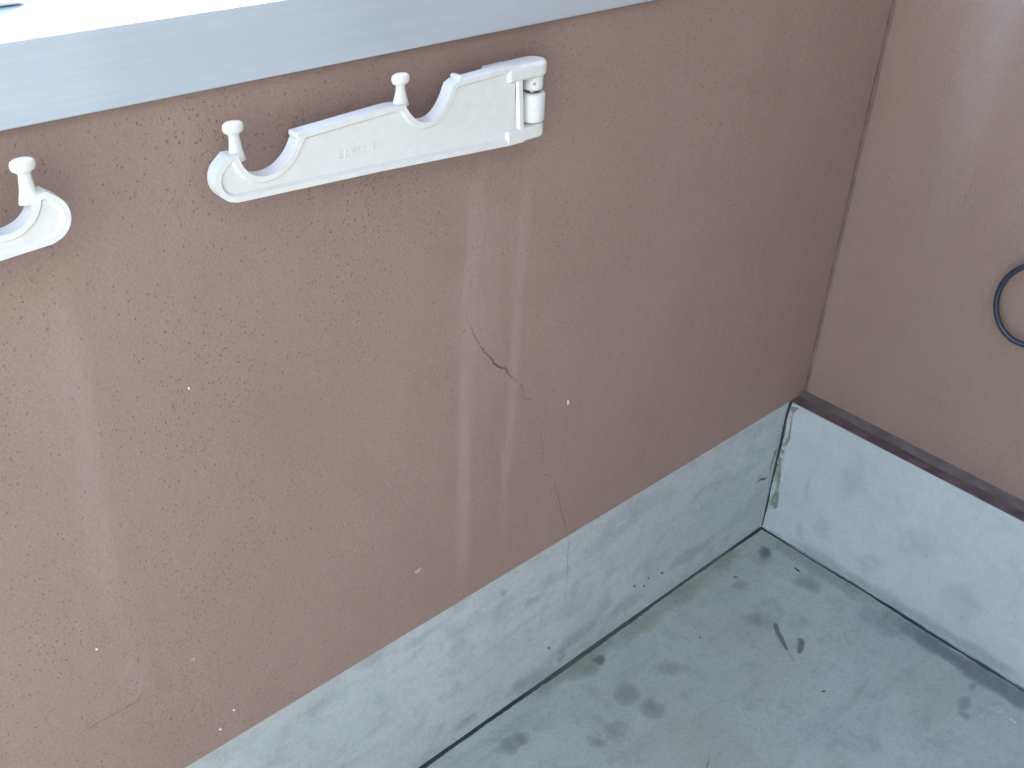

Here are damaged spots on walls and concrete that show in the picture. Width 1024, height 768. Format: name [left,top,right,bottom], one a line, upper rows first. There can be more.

crack [471,328,532,399]
peeling [768,407,799,509]